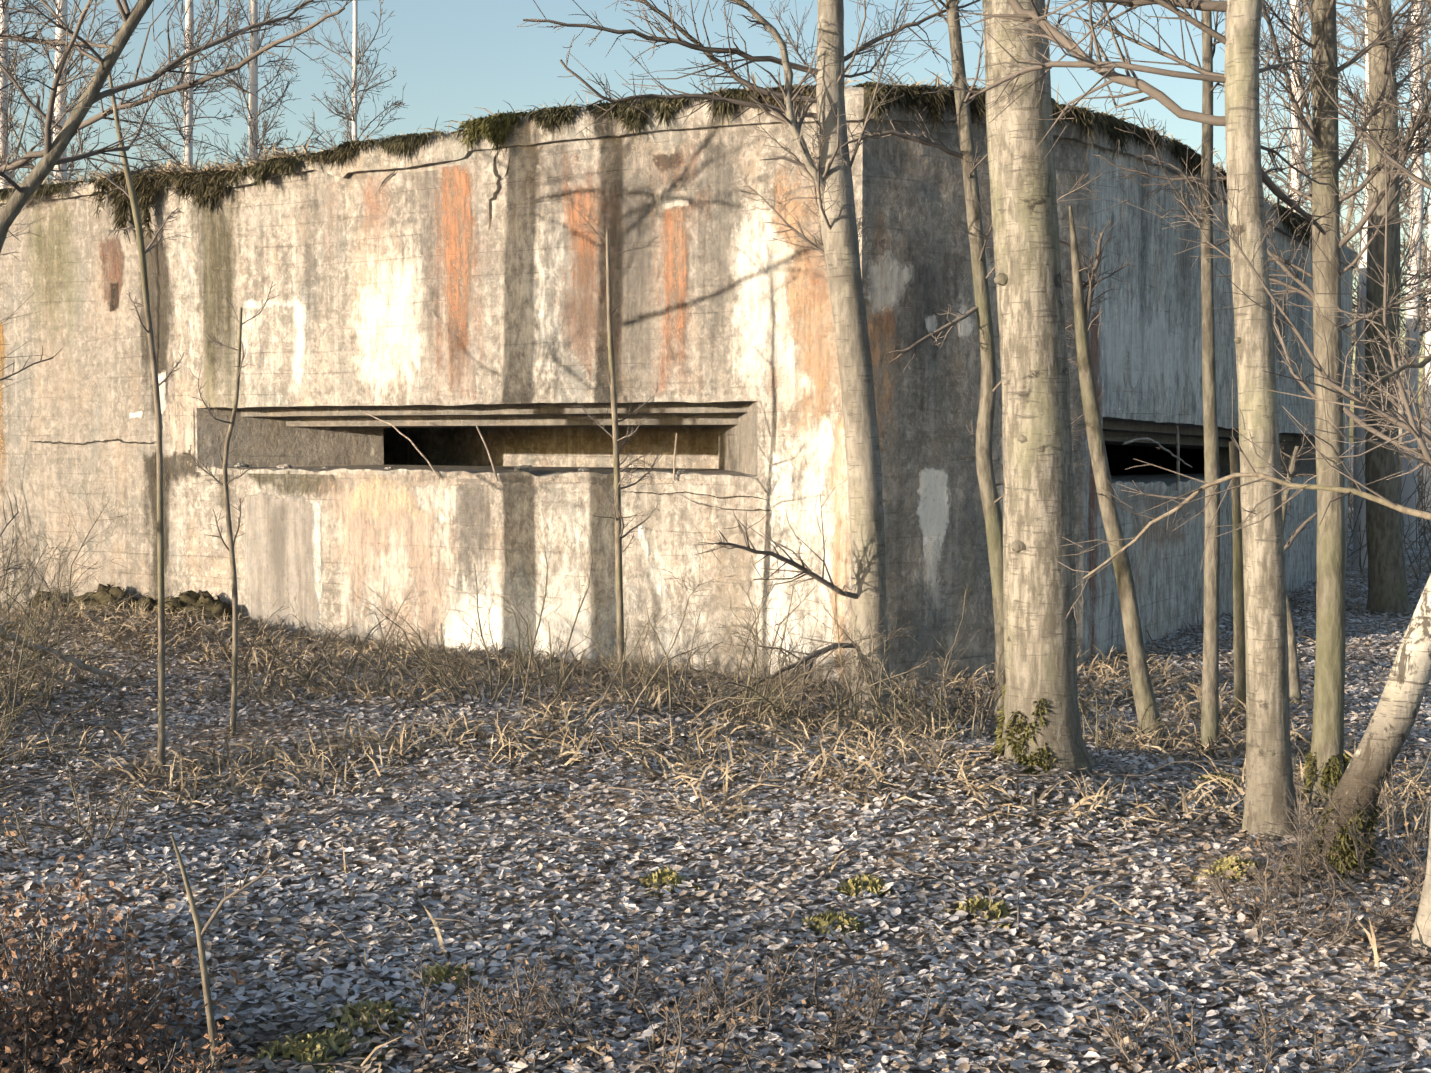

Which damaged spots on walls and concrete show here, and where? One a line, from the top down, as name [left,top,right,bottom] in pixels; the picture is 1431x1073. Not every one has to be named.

crack [29,437,156,445]
damp [139,231,172,414]
crack [152,232,160,366]
damp [143,452,198,600]
damp [195,191,306,385]
rust [437,165,471,383]
crack [488,154,511,229]
rust [564,187,599,363]
rust [660,199,689,388]
rust [772,178,851,674]
rust [868,305,895,412]